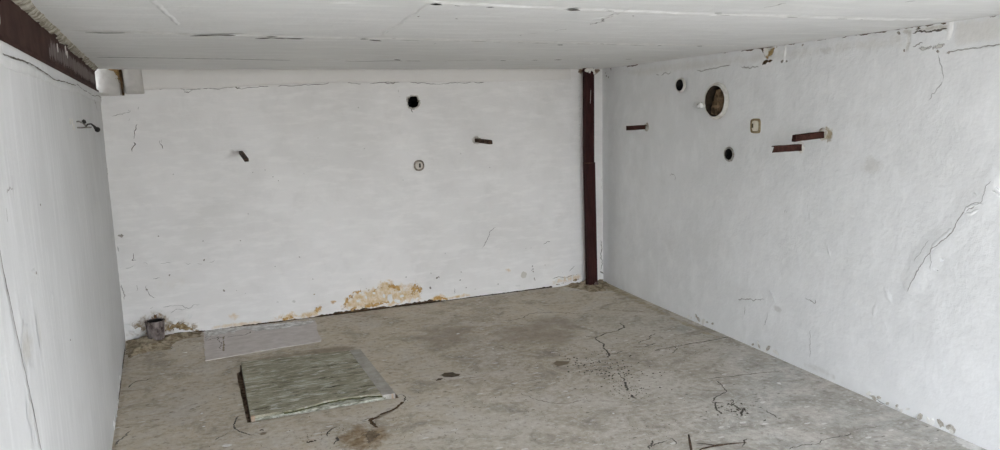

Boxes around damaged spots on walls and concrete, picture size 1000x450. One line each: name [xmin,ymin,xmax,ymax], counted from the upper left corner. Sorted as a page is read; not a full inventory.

spalling [897,23,950,54]
spalling [743,47,788,69]
crack [3,53,163,150]
crack [908,180,992,289]
leakage [124,310,264,337]
crack [588,323,727,399]
crack [360,395,406,428]